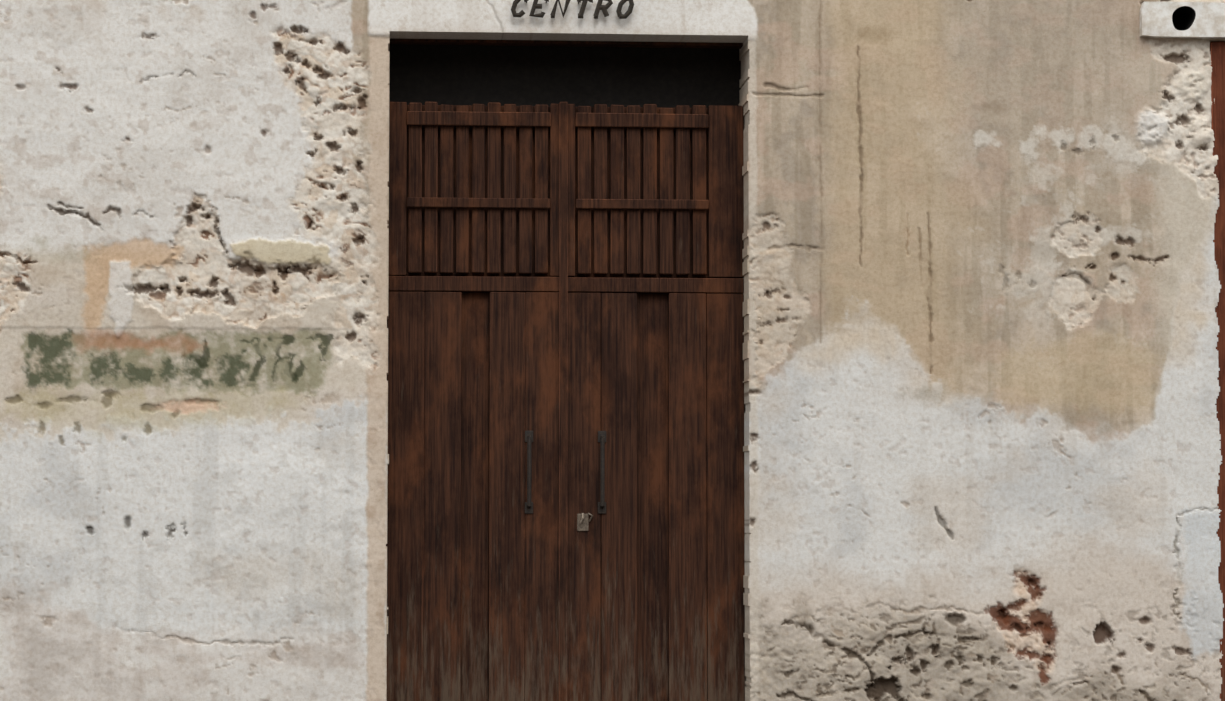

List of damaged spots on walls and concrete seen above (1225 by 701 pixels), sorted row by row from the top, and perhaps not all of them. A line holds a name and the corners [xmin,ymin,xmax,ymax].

spalling [250,4,277,20]
flaking render [0,251,38,336]
flaking render [6,26,382,445]
flaking render [749,214,811,386]
flaking render [999,213,1170,330]
damp [895,379,955,408]
crack [144,632,247,647]
flaking render [889,570,1059,686]
peeling [1171,506,1224,661]